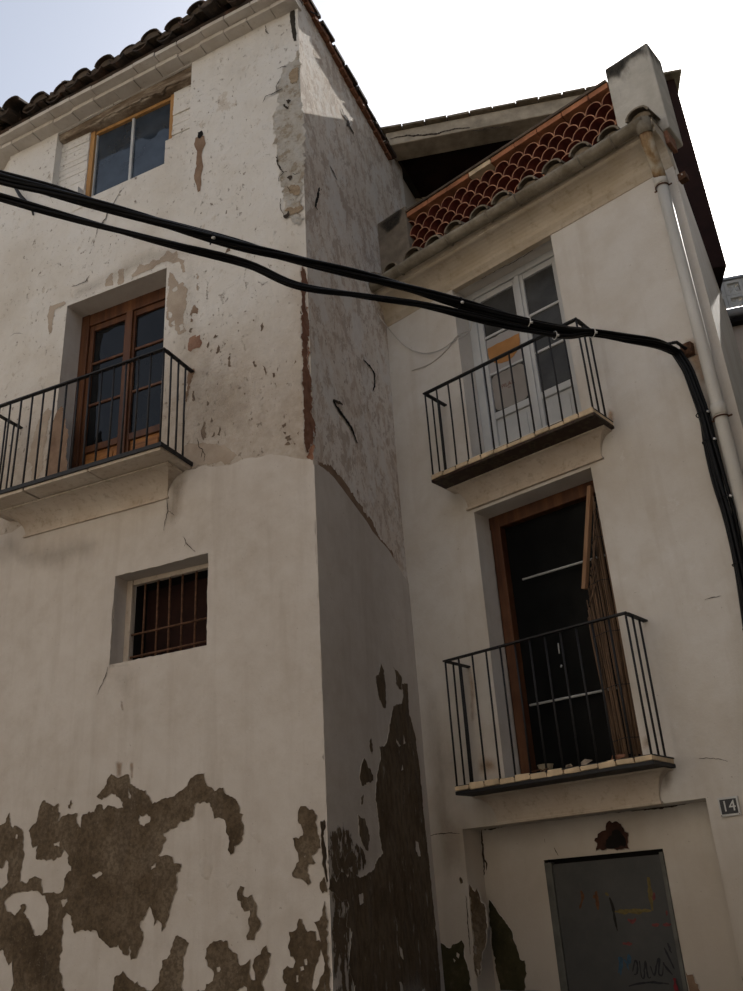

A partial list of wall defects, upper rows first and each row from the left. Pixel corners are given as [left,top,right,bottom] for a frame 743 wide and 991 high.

spalling [272,50,307,225]
flaking render [47,301,66,334]
flaking render [105,251,231,367]
crack [333,399,358,443]
peeling [0,773,244,991]
peeling [197,886,271,991]
peeling [283,663,441,991]
peeling [459,877,488,979]
spalling [594,820,630,851]